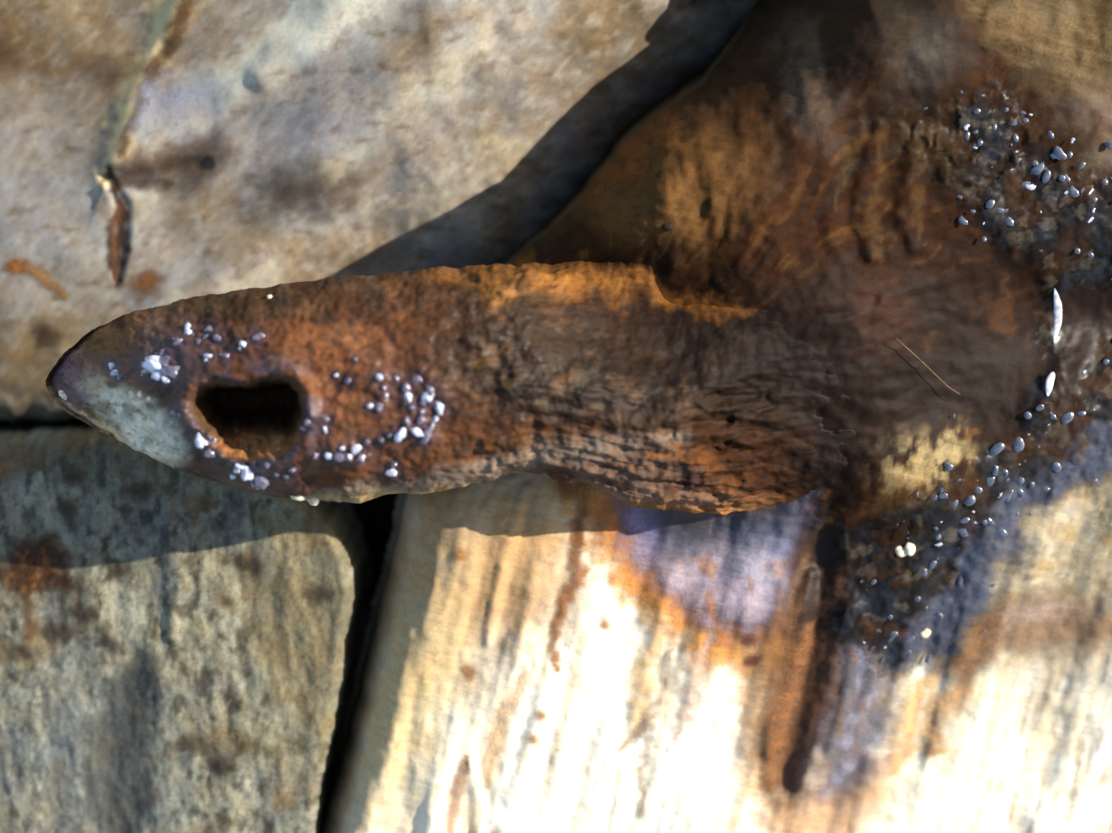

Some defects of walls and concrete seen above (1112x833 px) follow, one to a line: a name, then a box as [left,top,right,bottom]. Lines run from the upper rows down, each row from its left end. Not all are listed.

corrosion [133,270,162,298]
crack [106,0,193,288]
leakage [513,0,1112,833]